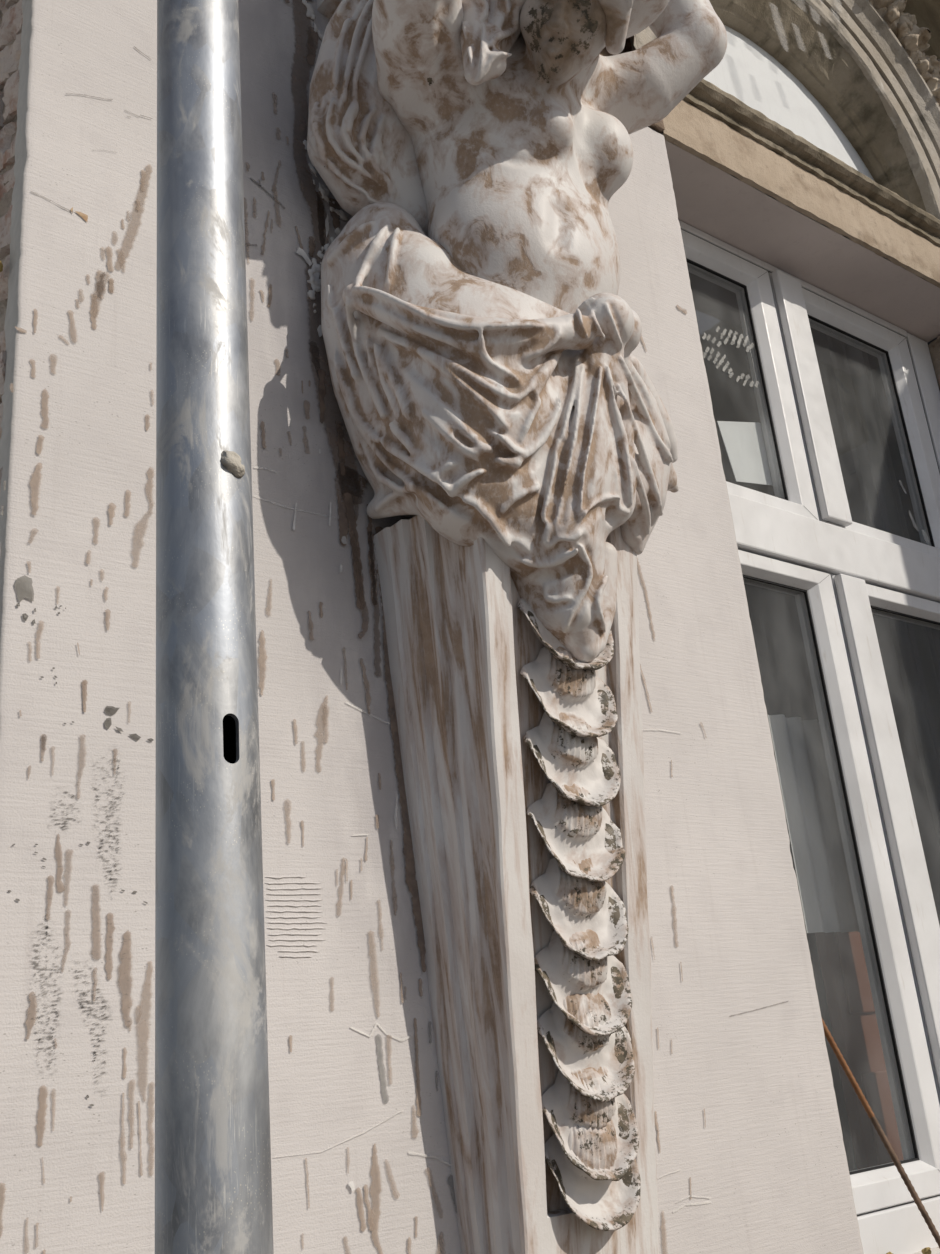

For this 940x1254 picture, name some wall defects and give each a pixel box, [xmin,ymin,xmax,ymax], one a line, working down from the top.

spalling [14,575,36,624]
spalling [104,706,153,741]